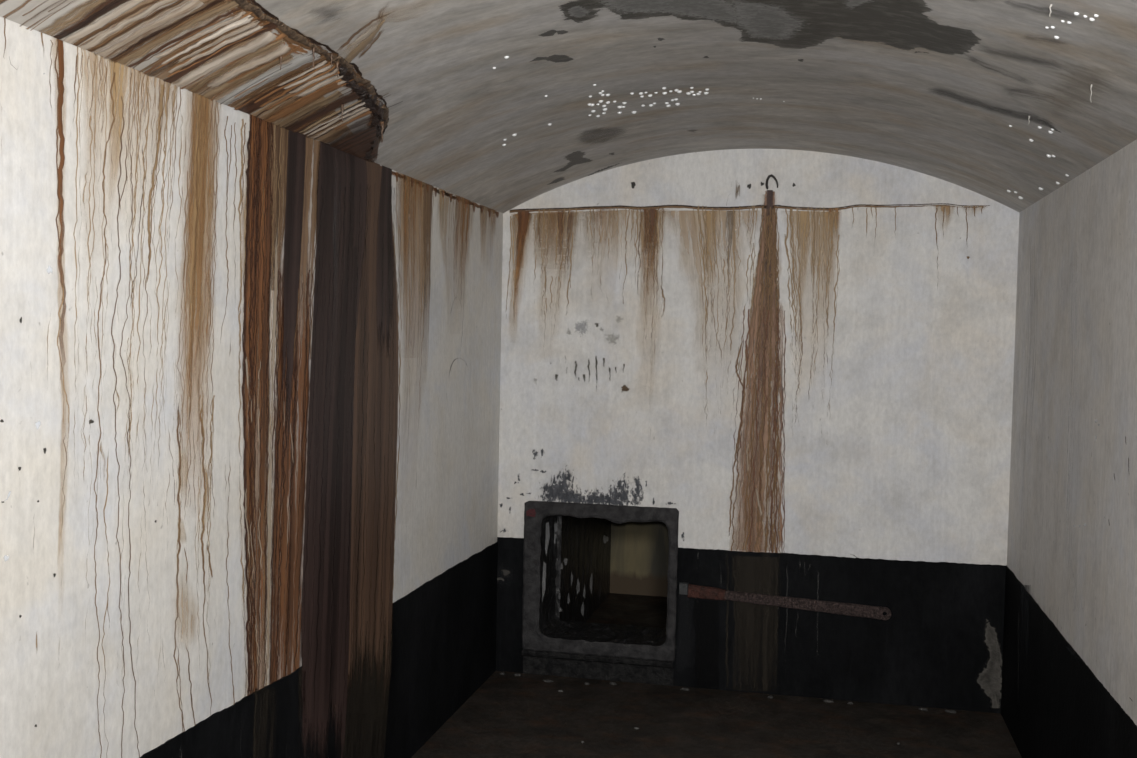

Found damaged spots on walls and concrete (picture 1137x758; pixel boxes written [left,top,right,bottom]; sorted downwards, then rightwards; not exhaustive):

leakage [539,0,981,62]
rust [935,205,983,268]
rust [41,33,320,758]
rust [381,166,877,553]
rust [679,582,891,620]
peeling [977,619,1003,708]